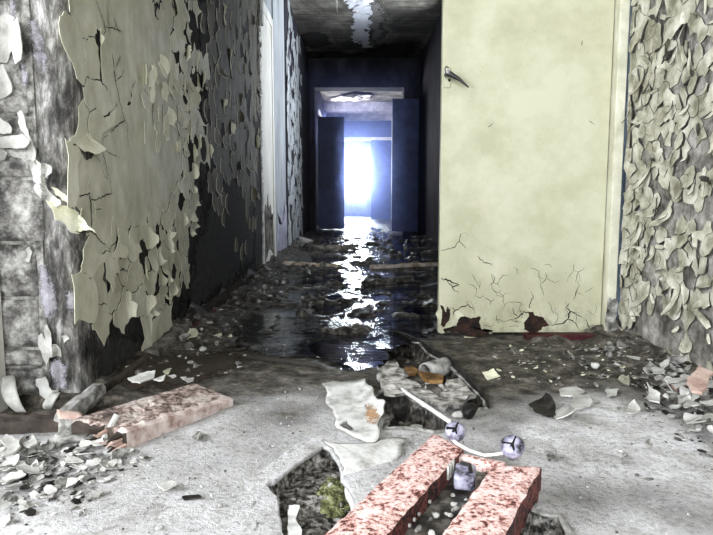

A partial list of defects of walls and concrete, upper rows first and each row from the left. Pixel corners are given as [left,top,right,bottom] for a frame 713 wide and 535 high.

peeling [344,0,374,48]
crack [75,55,128,250]
peeling [0,0,303,351]
peeling [605,0,713,363]
crack [441,258,597,332]
peeling [38,325,69,367]
peeling [36,377,59,399]